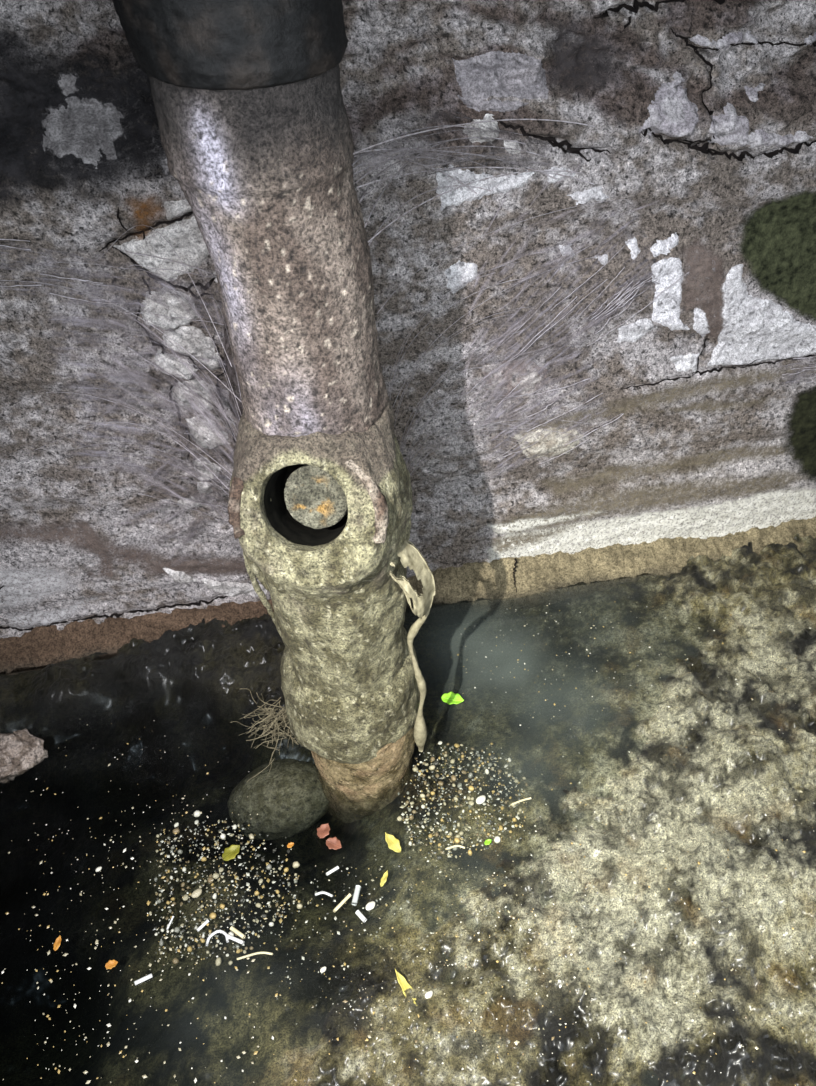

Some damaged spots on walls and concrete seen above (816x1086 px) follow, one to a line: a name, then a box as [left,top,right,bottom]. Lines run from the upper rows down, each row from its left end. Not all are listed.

crack [492,119,611,162]
crack [595,0,816,161]
crack [99,207,236,460]
spalling [113,199,230,511]
peeling [617,232,816,372]
crack [0,596,228,631]